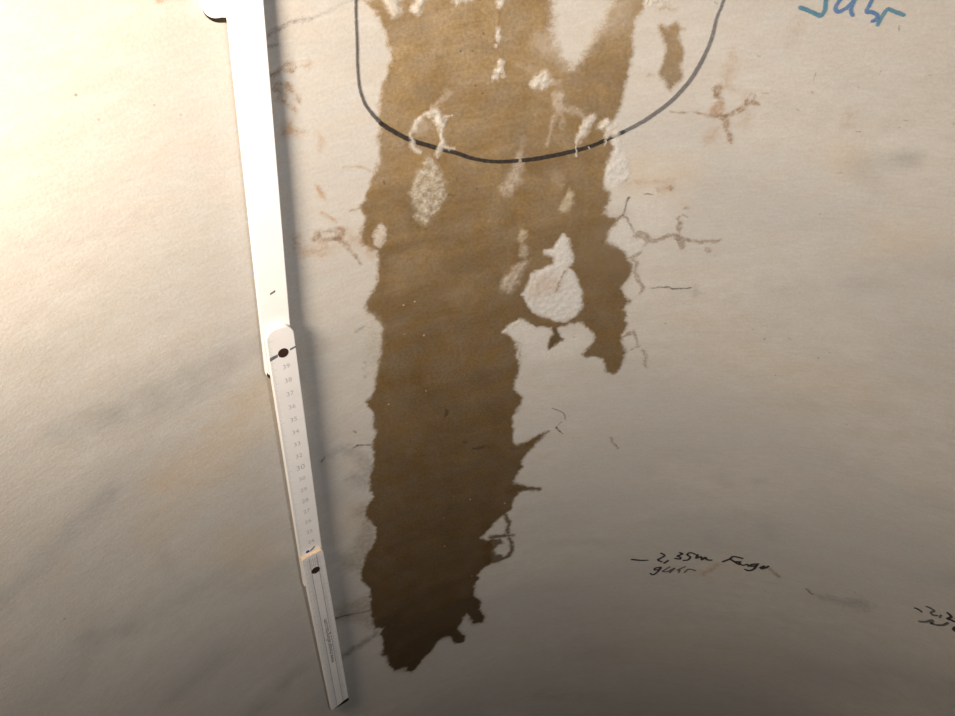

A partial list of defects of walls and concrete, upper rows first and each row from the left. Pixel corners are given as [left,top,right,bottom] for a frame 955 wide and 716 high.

water stain [361,0,665,671]
crack [617,197,720,293]